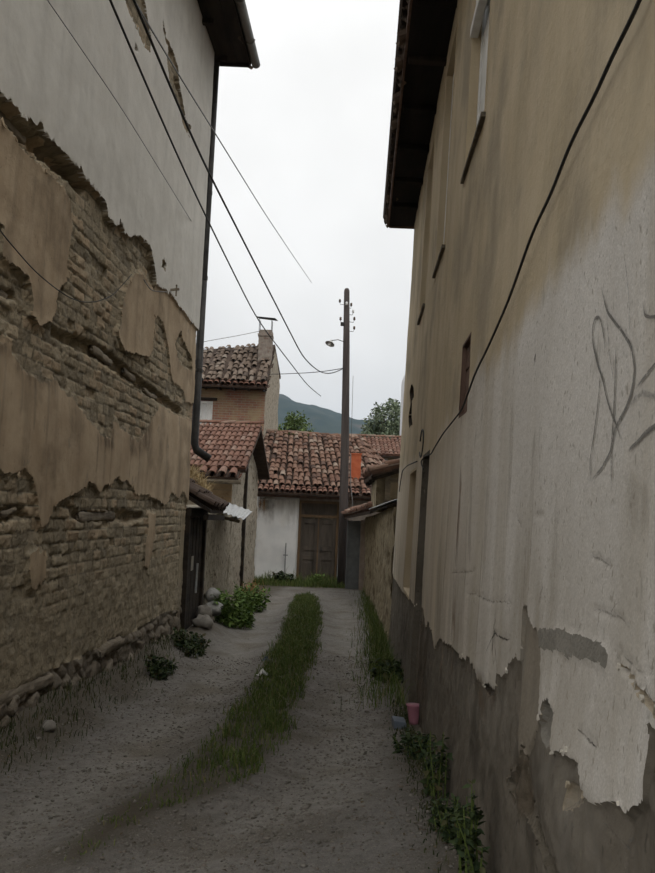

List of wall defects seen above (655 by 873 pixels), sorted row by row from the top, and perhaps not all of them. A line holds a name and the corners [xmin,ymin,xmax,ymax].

spalling [125,0,152,52]
spalling [163,19,191,138]
spalling [0,91,194,442]
spalling [0,468,188,695]
peeling [389,578,655,873]